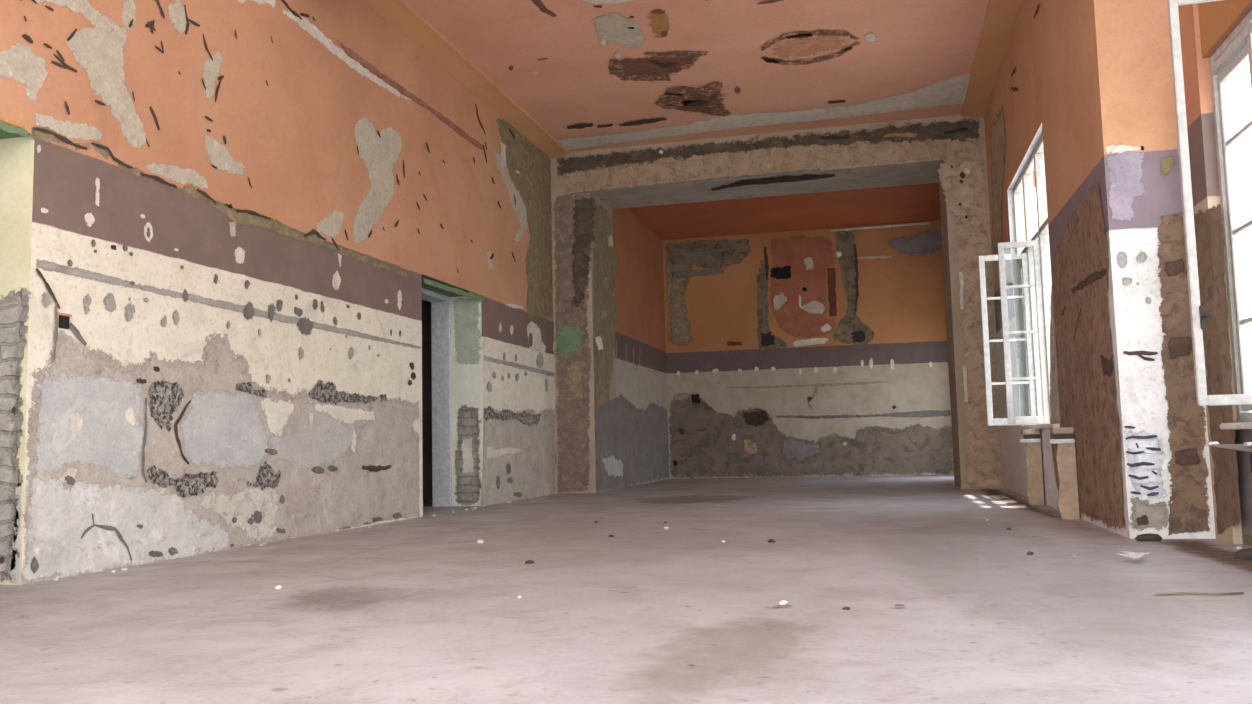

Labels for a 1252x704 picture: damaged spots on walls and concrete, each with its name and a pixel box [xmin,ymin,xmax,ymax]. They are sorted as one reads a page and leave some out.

peeling [582,0,646,59]
peeling [0,0,224,148]
peeling [145,116,252,192]
peeling [225,204,236,237]
peeling [316,116,420,243]
flaking render [1161,156,1175,175]
flaking render [454,104,1006,506]
flaking render [1050,182,1241,535]
crack [142,398,191,483]
flaking render [0,288,421,585]
crack [81,513,132,561]